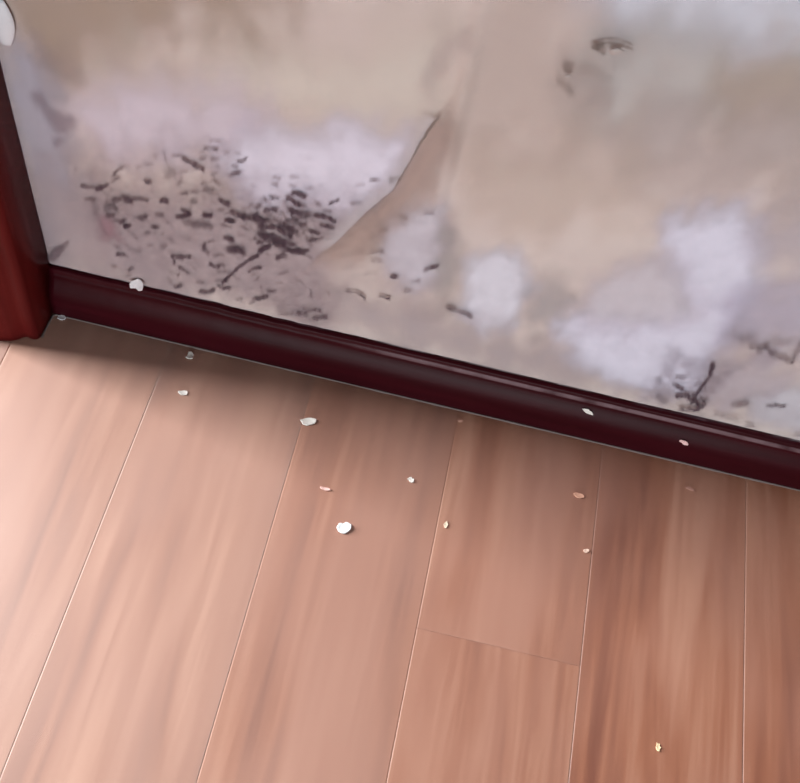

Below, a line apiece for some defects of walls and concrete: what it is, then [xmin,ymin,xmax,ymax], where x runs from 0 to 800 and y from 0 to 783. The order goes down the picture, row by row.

damp [5,46,339,321]
peeling [322,117,445,260]
damp [674,352,786,412]
damp [730,283,800,363]